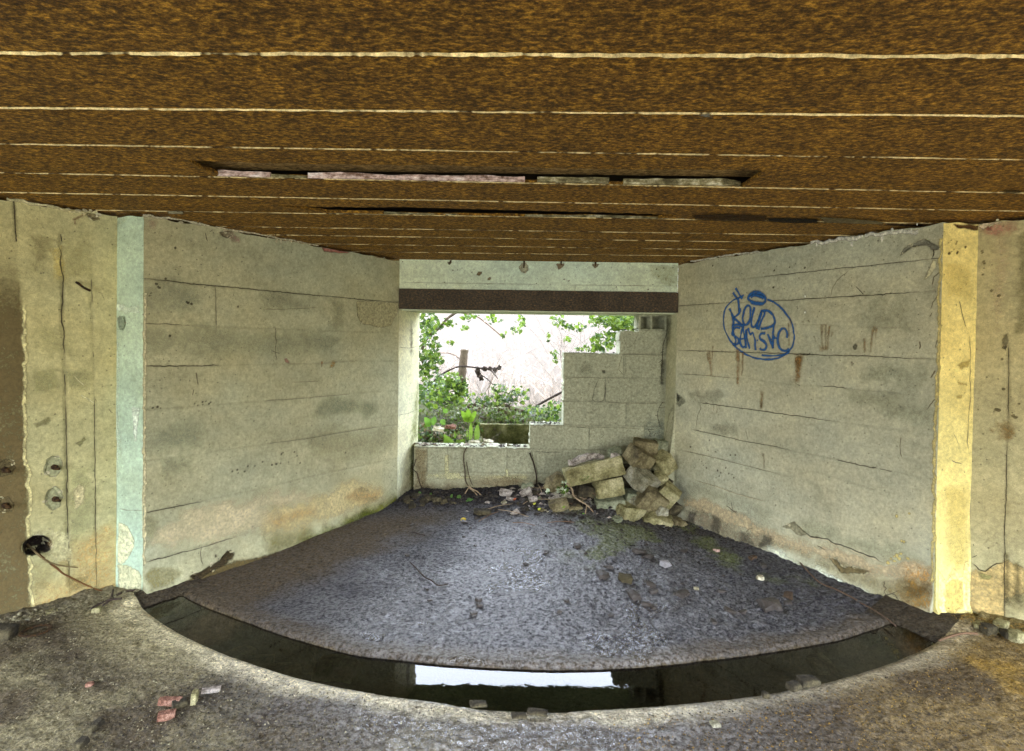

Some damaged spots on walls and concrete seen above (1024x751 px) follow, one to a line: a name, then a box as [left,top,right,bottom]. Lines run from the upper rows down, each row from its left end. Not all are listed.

peeling [218,170,609,184]
peeling [623,178,741,186]
spalling [117,278,167,590]
water stain [157,480,383,580]
water stain [686,511,791,561]
water stain [147,568,174,588]
crack [805,532,899,600]
water stain [817,563,933,608]